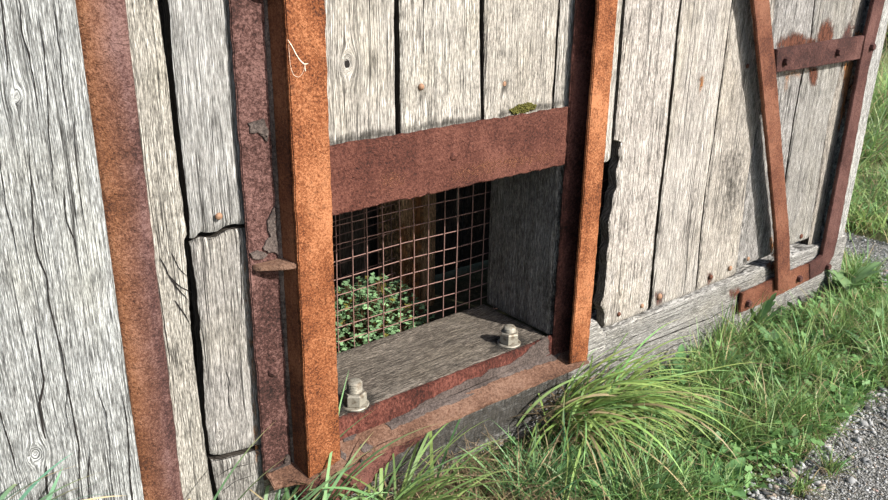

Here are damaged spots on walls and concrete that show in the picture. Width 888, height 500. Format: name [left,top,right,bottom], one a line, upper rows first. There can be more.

corrosion [777,19,863,48]
corrosion [248,118,269,142]
corrosion [838,61,854,131]
crack [0,0,133,500]
corrosion [250,207,279,260]
corrosion [766,237,775,272]
crack [158,253,190,381]
corrosion [385,336,560,430]